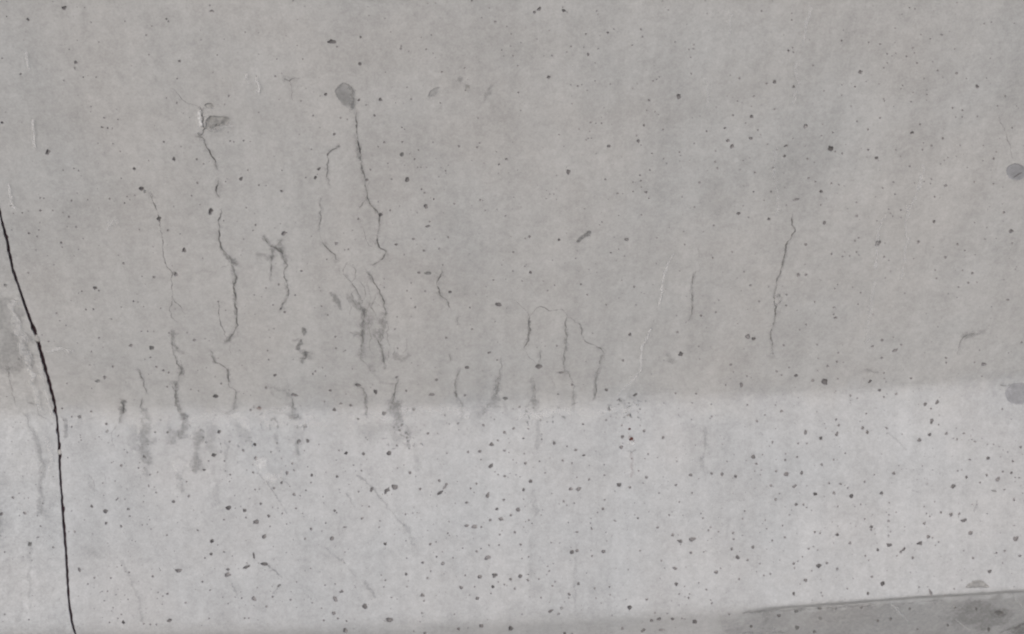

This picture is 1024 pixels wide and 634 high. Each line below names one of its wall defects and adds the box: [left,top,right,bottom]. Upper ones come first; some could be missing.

crack [178,94,238,415]
crack [265,238,289,309]
crack [319,113,407,410]
crack [770,214,796,345]
crack [518,303,605,409]